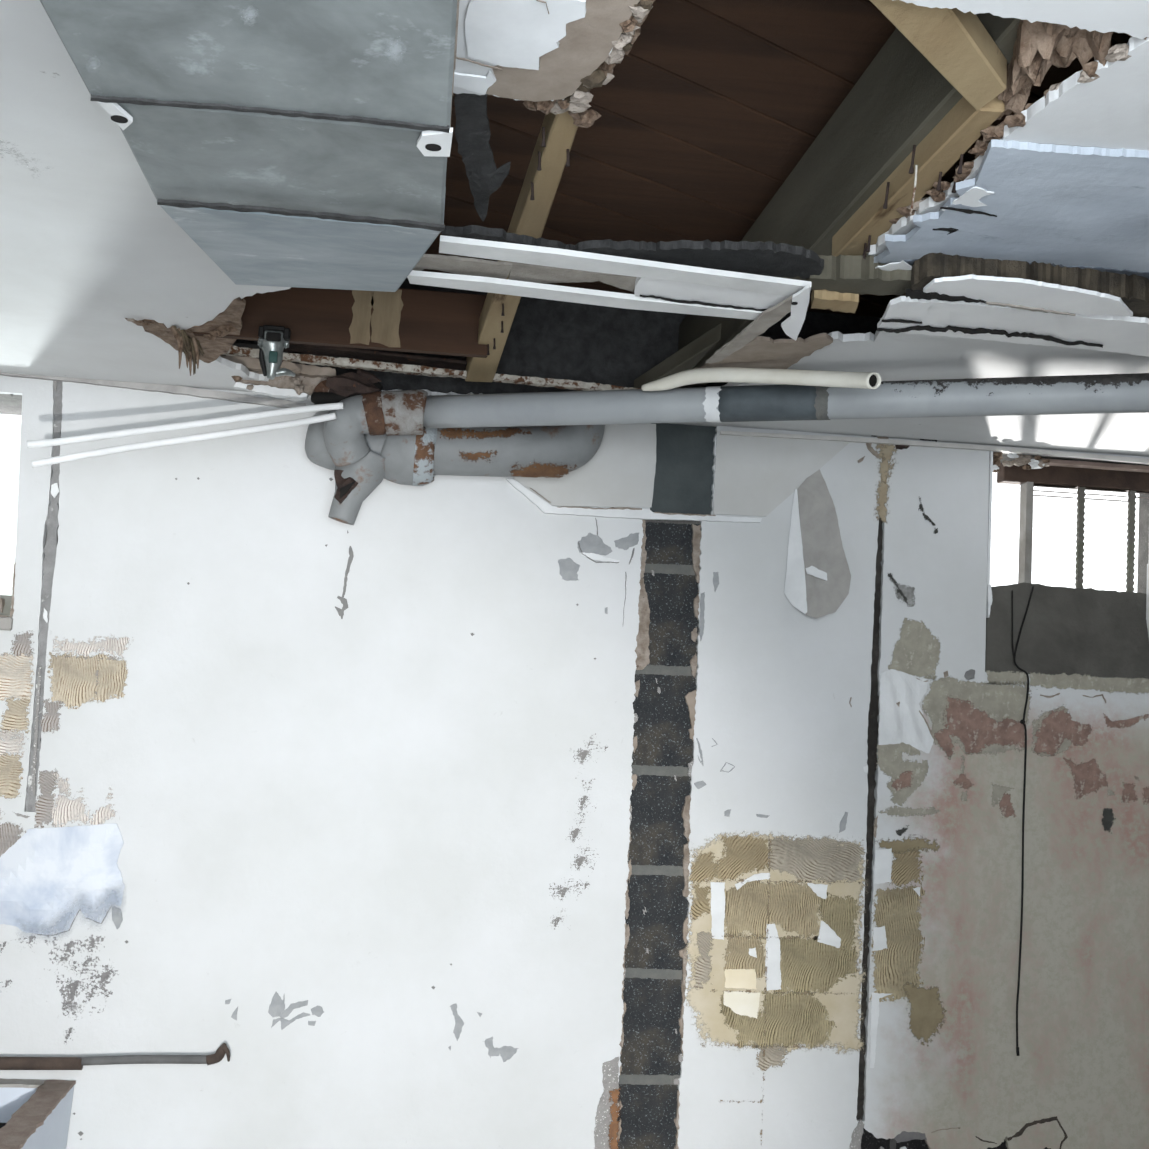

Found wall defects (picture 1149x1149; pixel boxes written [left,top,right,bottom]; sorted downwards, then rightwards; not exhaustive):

peeling [454,0,655,115]
spalling [889,20,1147,224]
corrosion [361,391,386,436]
corrosion [413,427,532,486]
corrosion [510,461,577,478]
peeling [784,469,851,618]
water stain [876,742,940,854]
water stain [1101,808,1116,833]
peeling [710,873,770,940]
peeling [723,924,782,1018]
water stain [903,982,946,1046]
spalling [849,1119,929,1149]